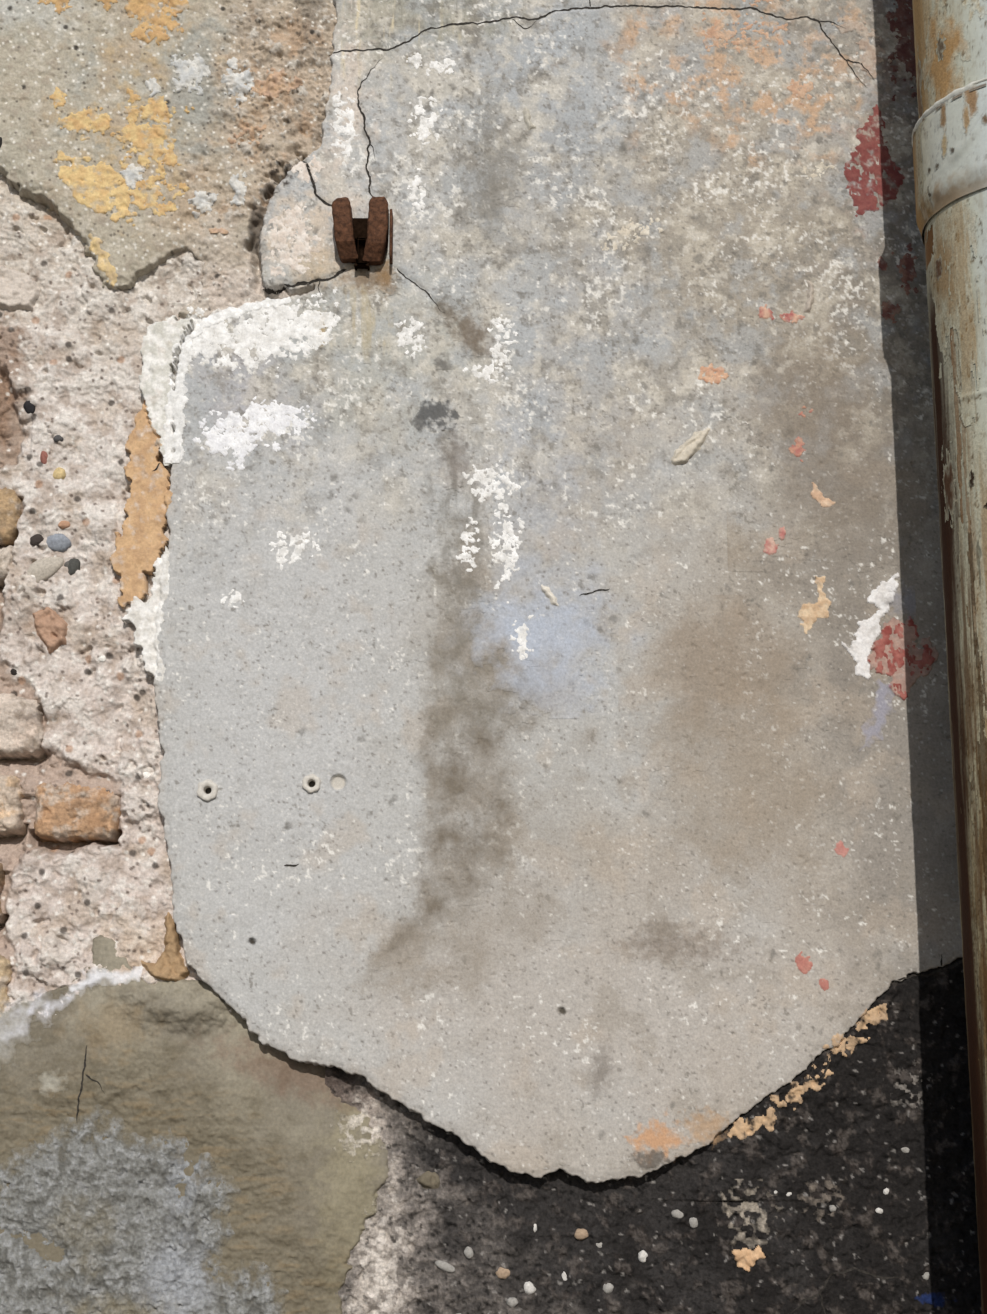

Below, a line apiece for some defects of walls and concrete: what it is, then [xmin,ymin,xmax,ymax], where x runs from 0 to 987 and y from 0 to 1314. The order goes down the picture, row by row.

crack [298,159,332,206]
peeling [291,87,358,183]
peeling [407,96,443,145]
peeling [406,53,456,76]
crack [329,0,875,197]
peeling [802,0,917,217]
crack [263,269,347,295]
crack [397,269,442,312]
spalling [0,173,341,1007]
leakage [343,396,861,1005]
peeling [841,573,939,701]
spalling [325,951,982,1314]